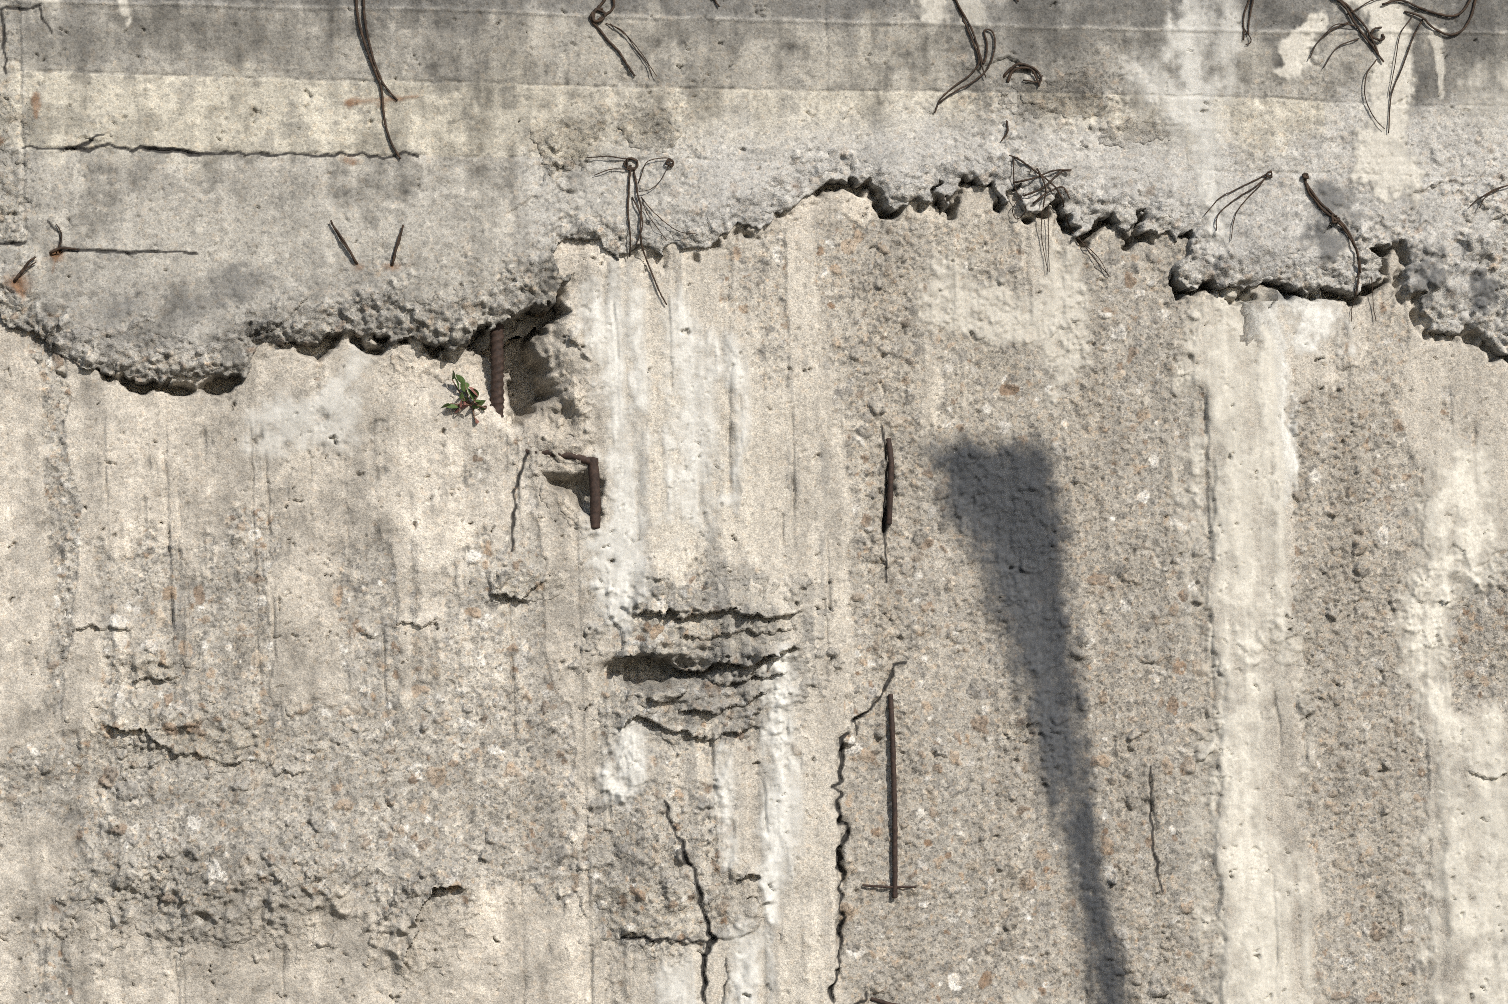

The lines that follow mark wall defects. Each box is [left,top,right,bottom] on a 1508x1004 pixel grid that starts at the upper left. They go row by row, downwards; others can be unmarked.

spalling [529,111,682,180]
water stain [912,0,985,26]
spalling [998,67,1191,149]
water stain [1133,0,1225,242]
water stain [1273,0,1508,261]
spalling [0,147,1383,540]
water stain [1410,259,1497,313]
spalling [1404,172,1508,348]
crack [881,426,889,583]
spalling [559,552,845,761]
crack [621,800,730,1004]
crack [828,661,907,1004]